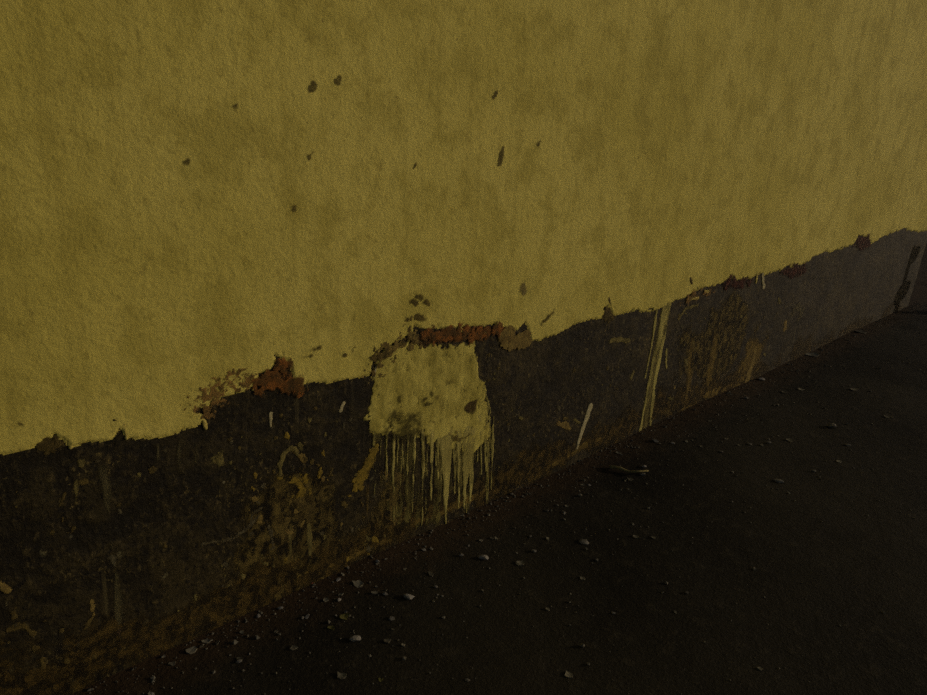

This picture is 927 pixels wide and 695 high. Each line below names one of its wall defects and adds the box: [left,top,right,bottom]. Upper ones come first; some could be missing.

water stain [0,293,900,695]